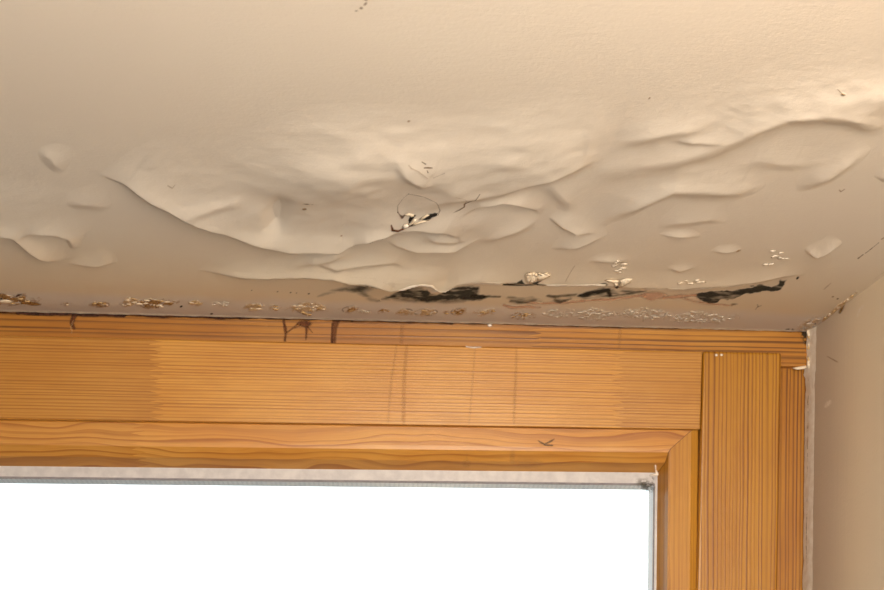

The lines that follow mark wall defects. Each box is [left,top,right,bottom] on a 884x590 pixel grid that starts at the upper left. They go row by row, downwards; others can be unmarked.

peeling [197,250,805,325]